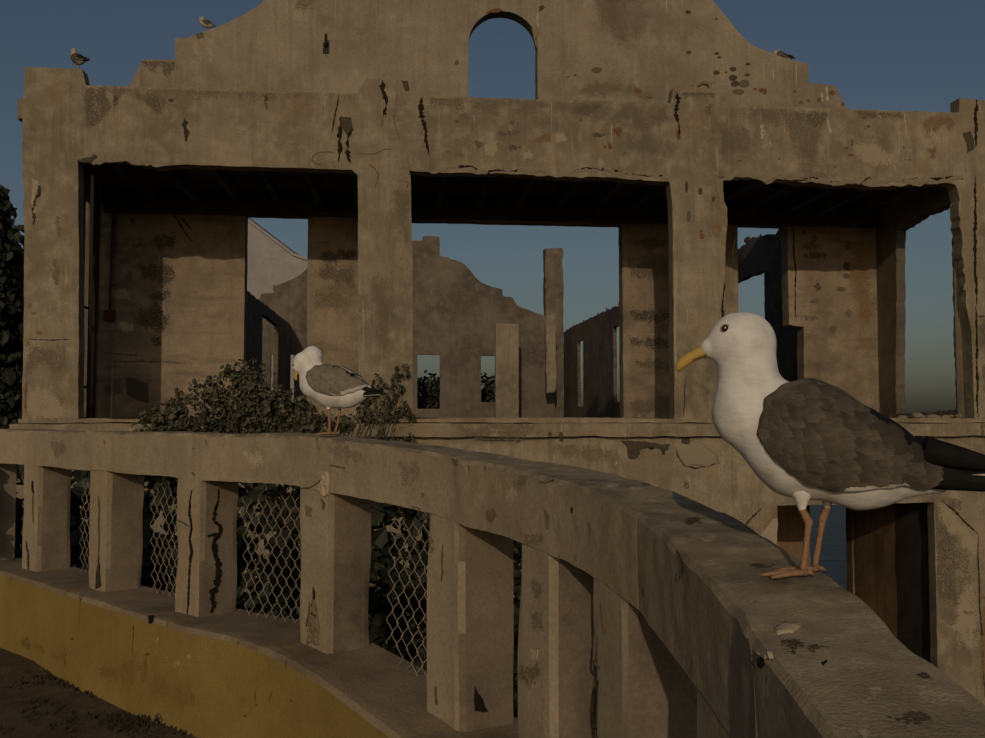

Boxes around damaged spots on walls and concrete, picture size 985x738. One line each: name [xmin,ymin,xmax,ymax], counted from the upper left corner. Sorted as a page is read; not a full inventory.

spalling [73,151,164,166]
crack [311,80,430,187]
crack [459,165,517,174]
crack [972,99,980,147]
crack [903,176,985,417]
crack [177,472,222,614]